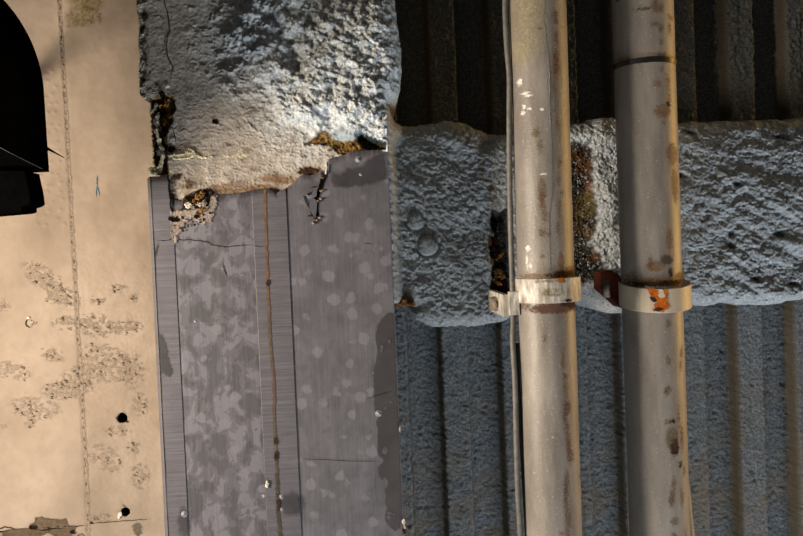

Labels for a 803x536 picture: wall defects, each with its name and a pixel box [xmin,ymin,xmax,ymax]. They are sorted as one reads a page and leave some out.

crack [151,0,174,81]
flaking render [306,128,386,155]
spalling [168,189,217,244]
corrosion [521,270,576,314]
corrosion [625,256,683,327]
corrosion [263,189,282,536]
damp [373,313,402,531]
corrosion [666,419,683,468]
spalling [2,516,82,536]
crack [45,519,147,528]